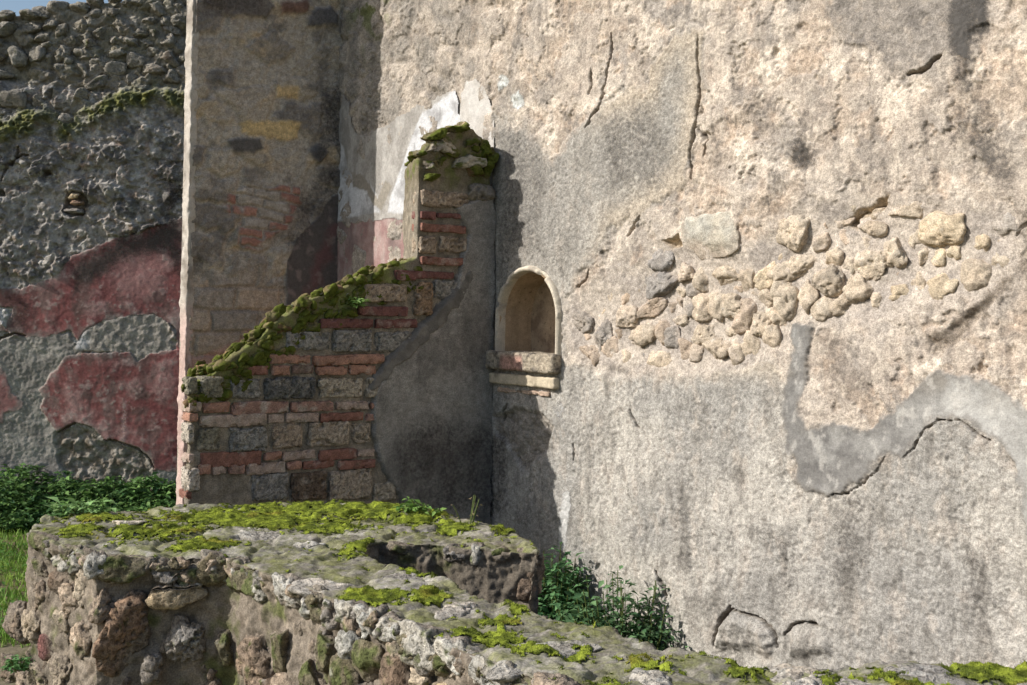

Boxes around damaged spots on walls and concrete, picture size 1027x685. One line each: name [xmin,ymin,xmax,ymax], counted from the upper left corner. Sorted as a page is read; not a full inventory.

peeling [337,79,494,223]
crack [586,33,614,125]
crack [689,38,709,179]
crack [906,56,941,76]
spalling [569,190,1027,373]
crack [0,332,26,340]
peeling [0,218,182,473]
crack [909,418,946,452]
crack [712,605,819,646]